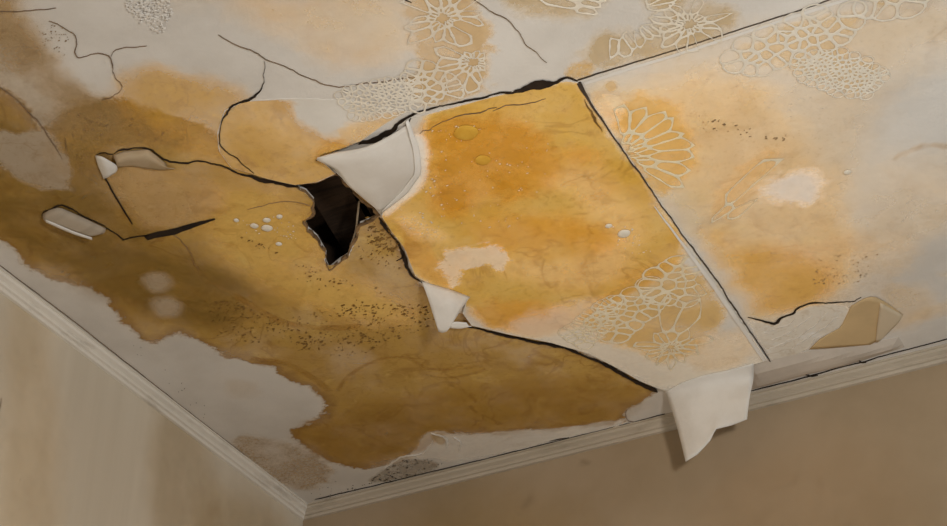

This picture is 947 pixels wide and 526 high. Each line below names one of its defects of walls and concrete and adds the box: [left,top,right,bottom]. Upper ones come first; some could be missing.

crack [316,0,578,161]
crack [42,34,415,268]
peeling [403,136,426,199]
water stain [652,96,799,194]
water stain [0,64,680,495]
crack [379,218,422,283]
crack [748,297,861,325]
crack [751,339,947,391]